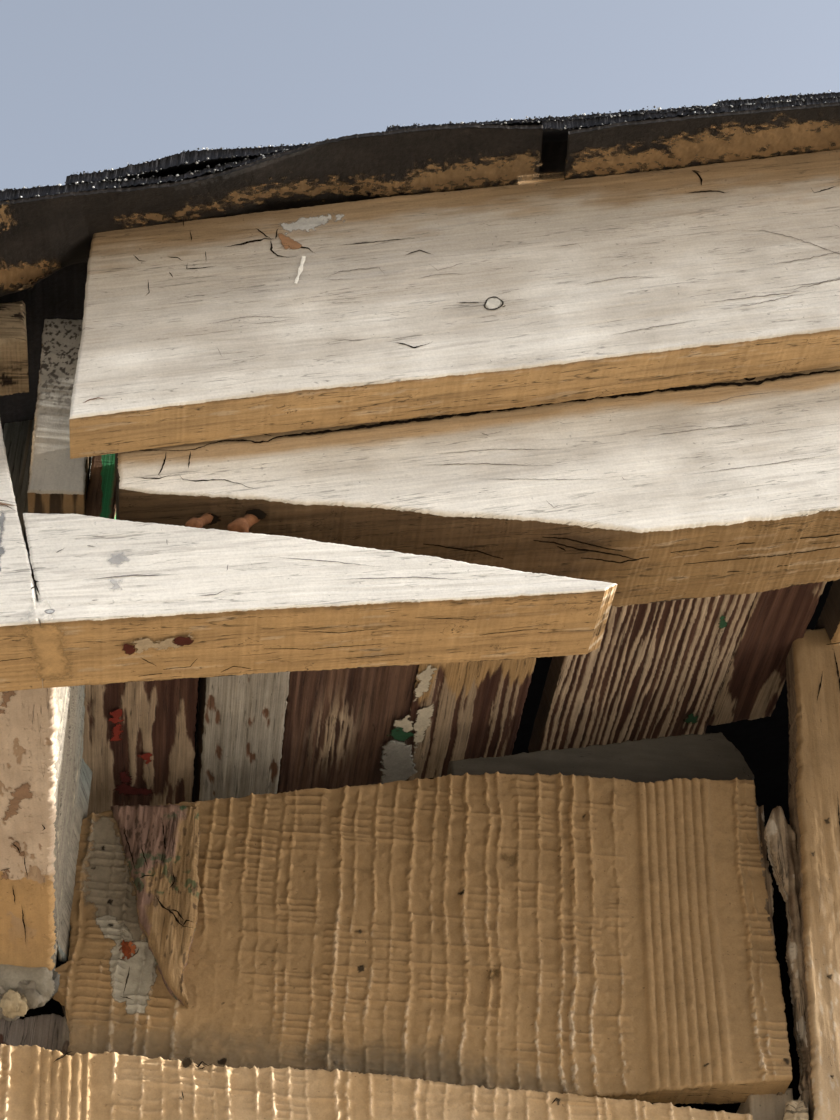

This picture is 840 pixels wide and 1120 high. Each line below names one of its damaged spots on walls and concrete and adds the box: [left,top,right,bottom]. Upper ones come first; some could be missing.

peeling [0,691,15,714]
peeling [3,783,32,821]
peeling [96,770,201,1009]